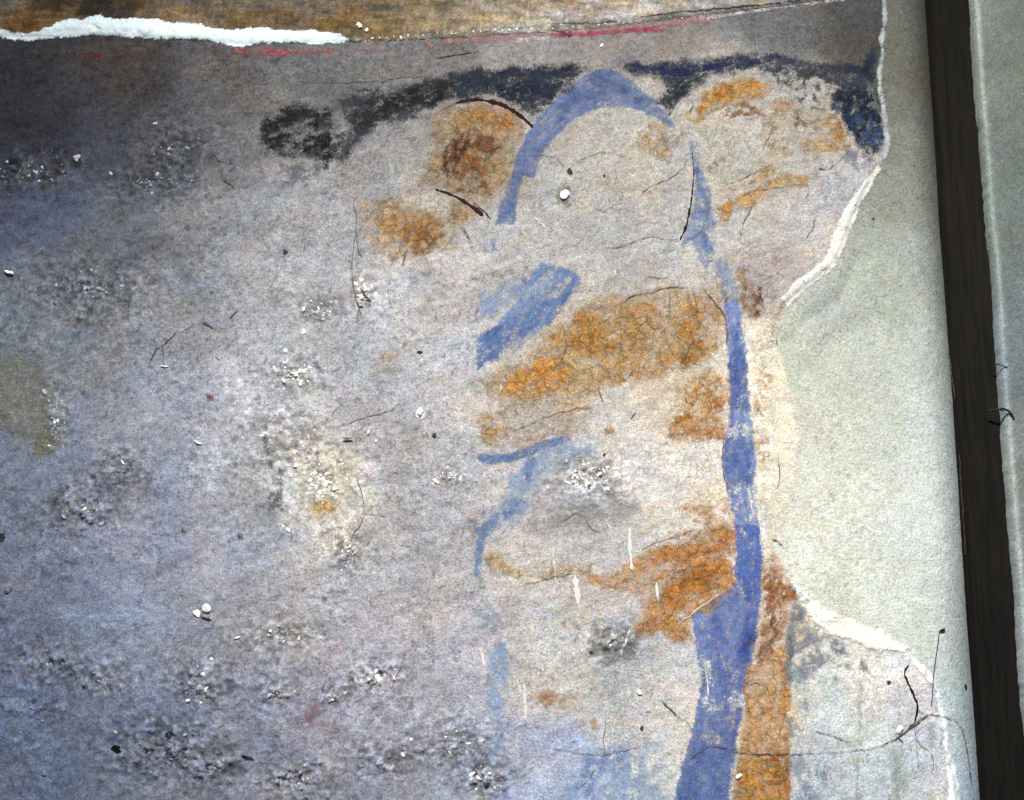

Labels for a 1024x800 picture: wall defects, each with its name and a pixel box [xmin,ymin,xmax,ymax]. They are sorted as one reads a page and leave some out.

spalling [0,7,776,47]
crack [596,153,694,249]
spalling [781,0,891,307]
crack [692,665,973,786]
spalling [787,573,960,800]